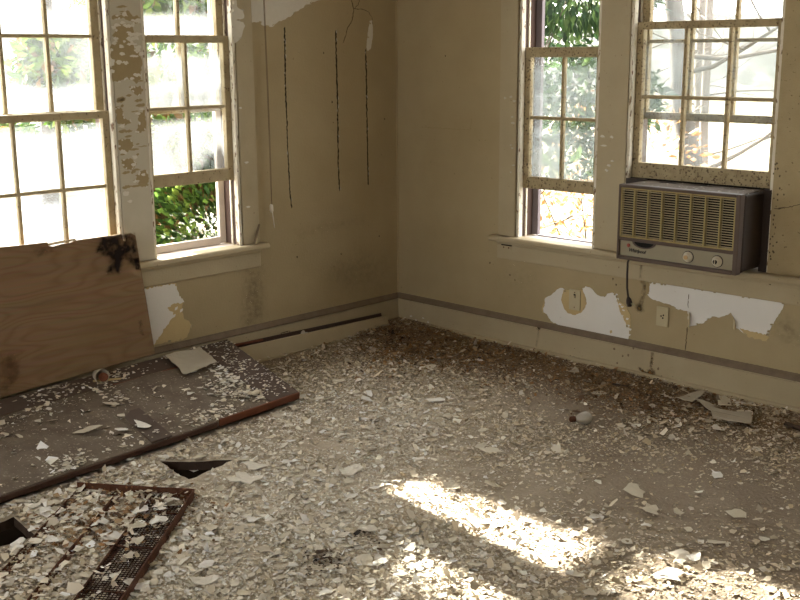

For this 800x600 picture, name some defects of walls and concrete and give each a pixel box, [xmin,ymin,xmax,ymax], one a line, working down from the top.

peeling [232,0,318,43]
peeling [110,5,149,203]
crack [284,27,292,208]
crack [335,0,373,191]
peeling [144,283,192,346]
peeling [542,286,631,339]
peeling [646,282,784,342]